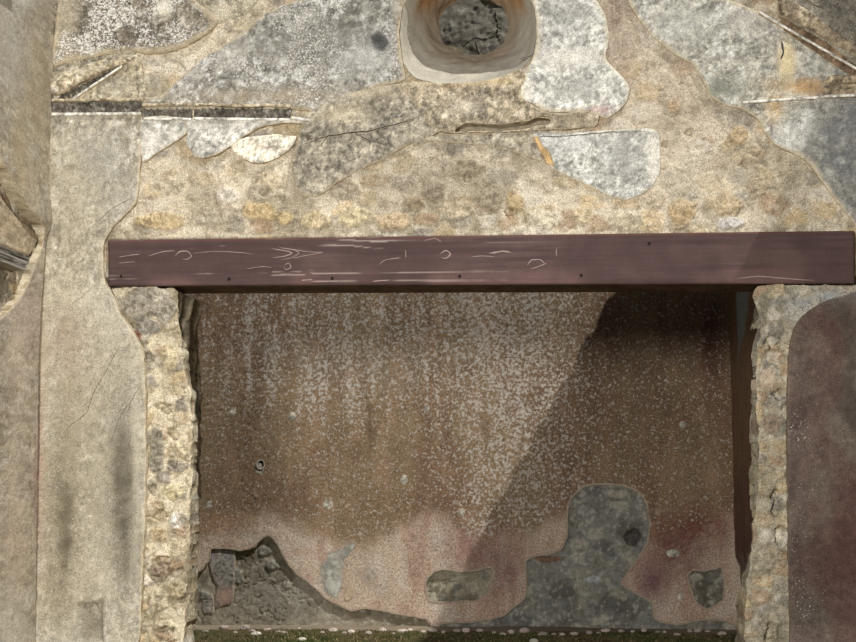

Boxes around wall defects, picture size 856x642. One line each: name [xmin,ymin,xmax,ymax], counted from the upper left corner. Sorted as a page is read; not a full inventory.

crack [463,9,501,54]
crack [302,117,418,145]
spalling [104,0,856,278]
crack [65,345,120,432]
crack [109,387,140,445]
spalling [110,276,856,642]